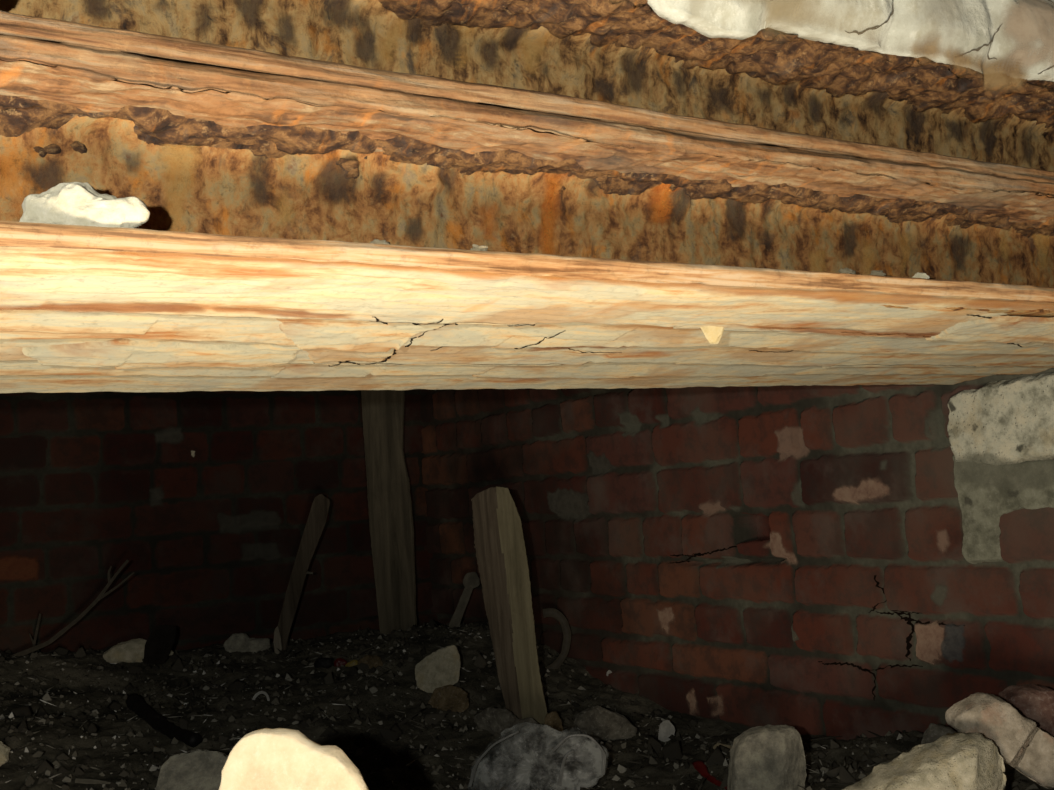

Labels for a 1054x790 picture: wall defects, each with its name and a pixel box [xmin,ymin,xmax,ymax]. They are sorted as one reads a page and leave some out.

rust [327,0,374,61]
rust [0,95,1054,270]
rust [0,304,200,312]
crack [328,317,458,367]
crack [507,324,621,353]
rust [721,289,1054,347]
spalling [775,427,809,461]
spalling [833,479,889,504]
crack [670,546,737,563]
spalling [766,533,797,563]
crack [818,575,965,701]
spalling [915,621,965,664]